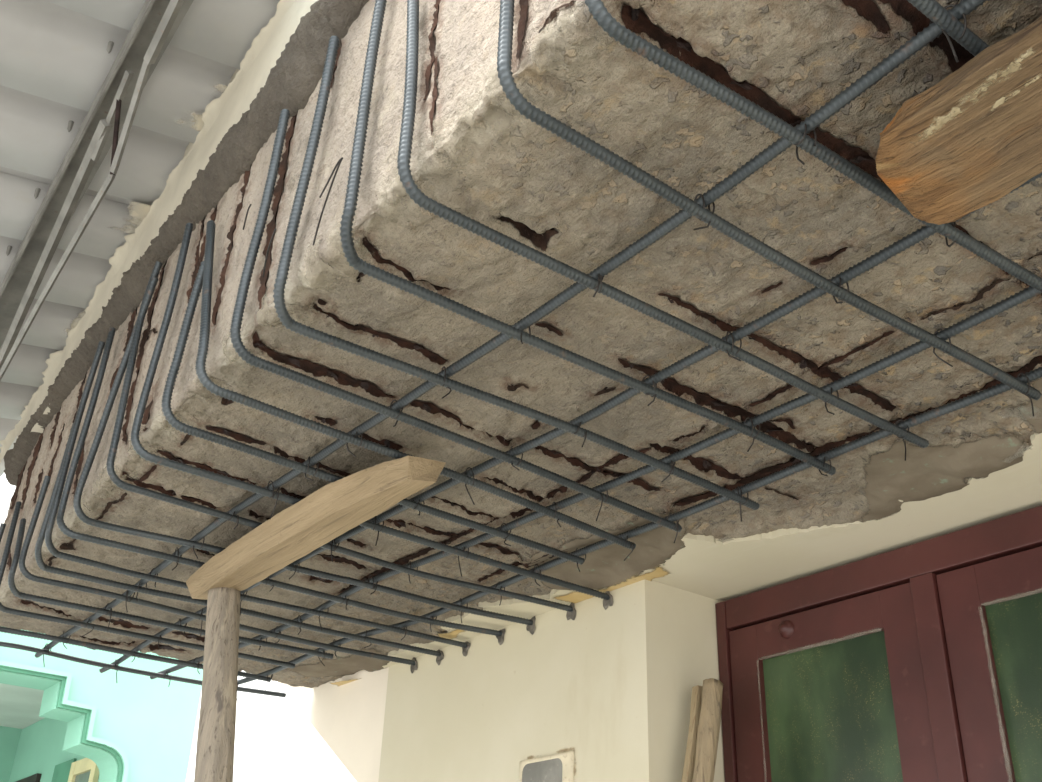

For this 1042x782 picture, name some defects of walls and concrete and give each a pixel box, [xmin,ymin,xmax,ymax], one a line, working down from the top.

spalling [0,0,501,664]
corrosion [258,111,298,314]
corrosion [252,331,395,398]
corrosion [423,0,441,135]
spalling [352,0,577,325]
spalling [409,0,682,274]
spalling [238,288,1035,688]
corrosion [309,293,1042,594]
corrosion [621,5,804,127]
spalling [601,0,953,160]
spalling [706,145,1042,387]
corrosion [842,0,933,35]